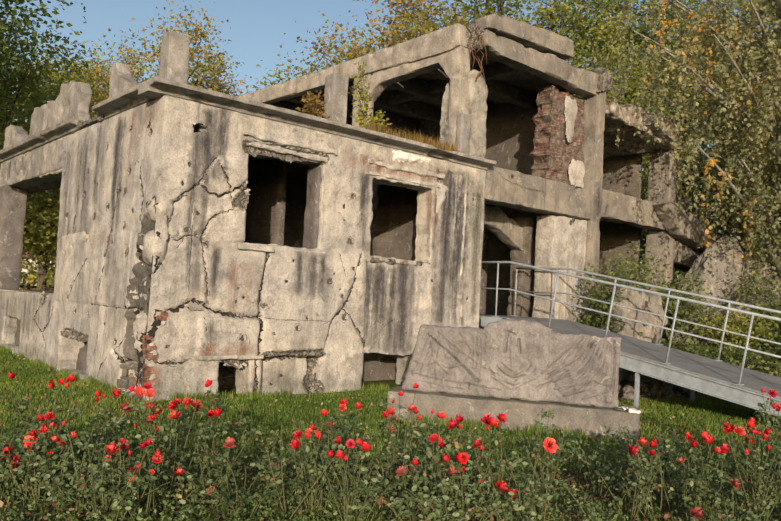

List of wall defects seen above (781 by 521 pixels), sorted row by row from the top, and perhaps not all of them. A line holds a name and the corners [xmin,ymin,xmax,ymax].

peeling [564,96,578,143]
peeling [568,159,585,188]
water stain [435,178,468,321]
crack [33,157,406,400]
flaking render [155,311,168,326]
water stain [366,265,414,350]
flaking render [141,335,170,386]